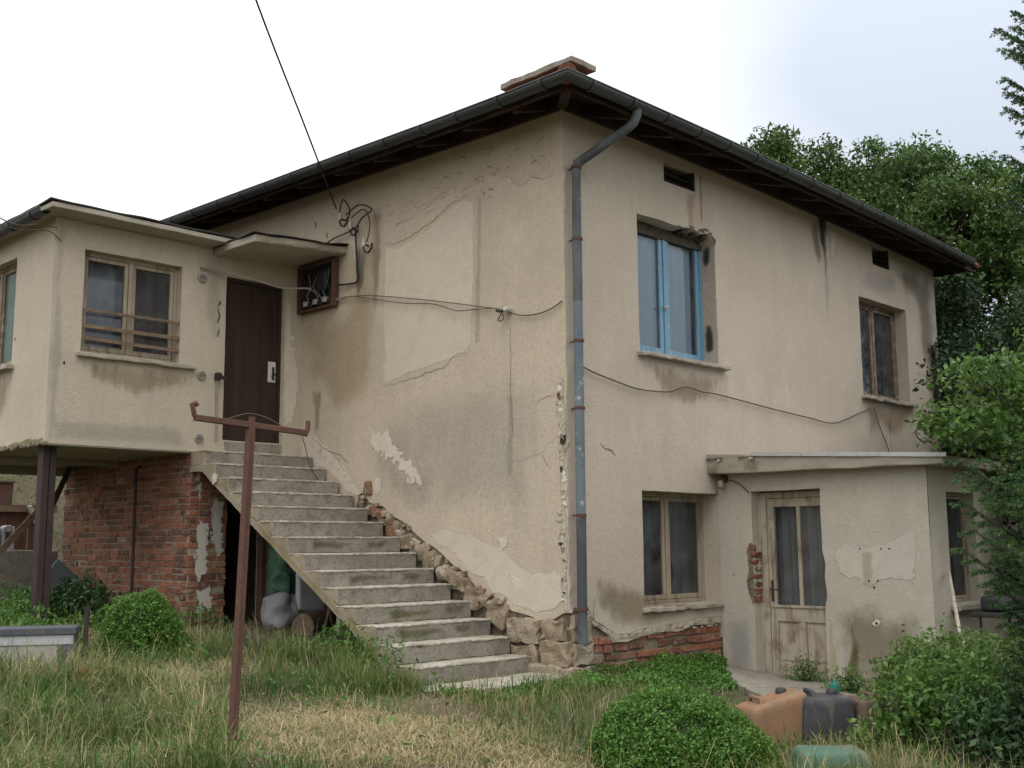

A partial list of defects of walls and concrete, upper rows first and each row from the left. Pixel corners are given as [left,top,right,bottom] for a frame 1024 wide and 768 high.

peeling [370,428,423,489]
peeling [428,378,568,613]
peeling [194,472,224,614]
flaking render [747,543,764,604]
spalling [592,616,721,641]